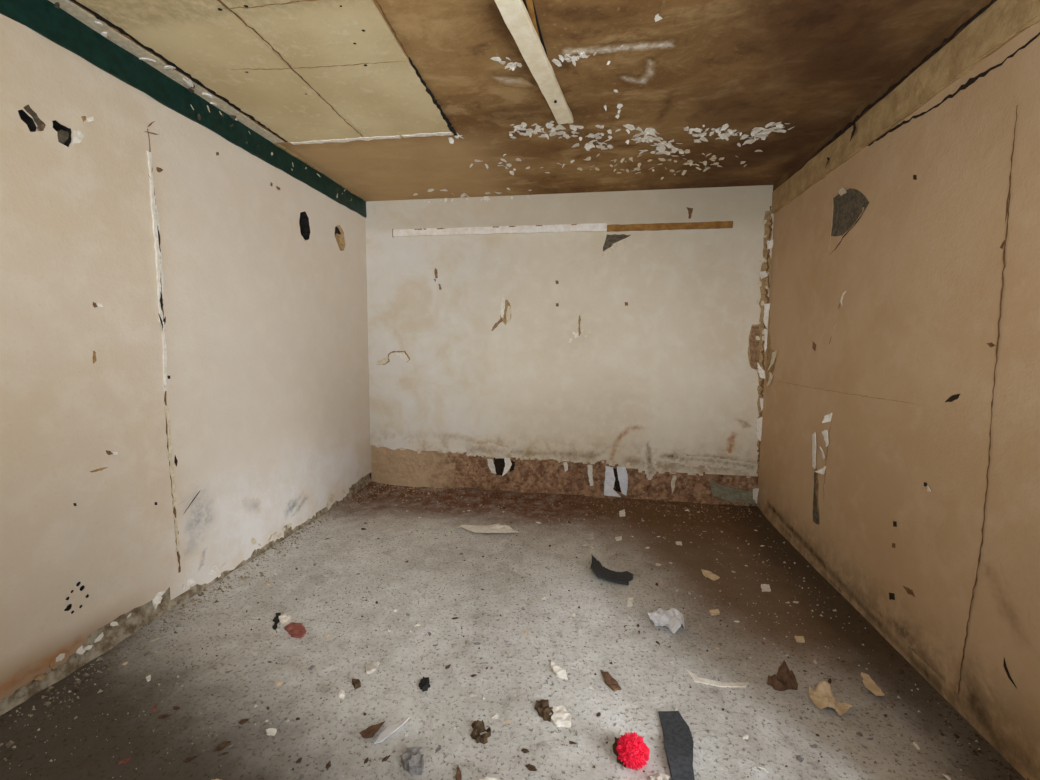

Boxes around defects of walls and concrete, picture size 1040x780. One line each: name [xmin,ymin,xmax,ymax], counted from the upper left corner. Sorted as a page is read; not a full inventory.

peeling [491,57,522,71]
water stain [462,0,617,134]
peeling [552,51,597,67]
water stain [560,0,980,126]
spalling [18,104,94,147]
peeling [470,90,793,180]
spalling [829,188,869,253]
spalling [0,206,777,716]